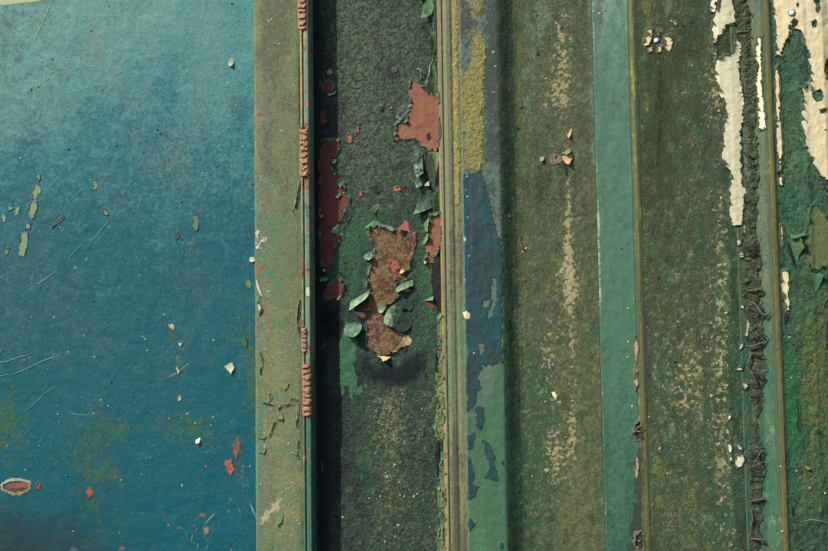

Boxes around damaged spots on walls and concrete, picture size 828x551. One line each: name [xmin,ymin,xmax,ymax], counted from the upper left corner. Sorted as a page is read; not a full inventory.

peeling [2,173,41,257]
peeling [316,0,446,551]
peeling [641,19,678,54]
peeling [709,0,748,259]
peeling [753,0,828,314]
peeling [0,478,41,496]